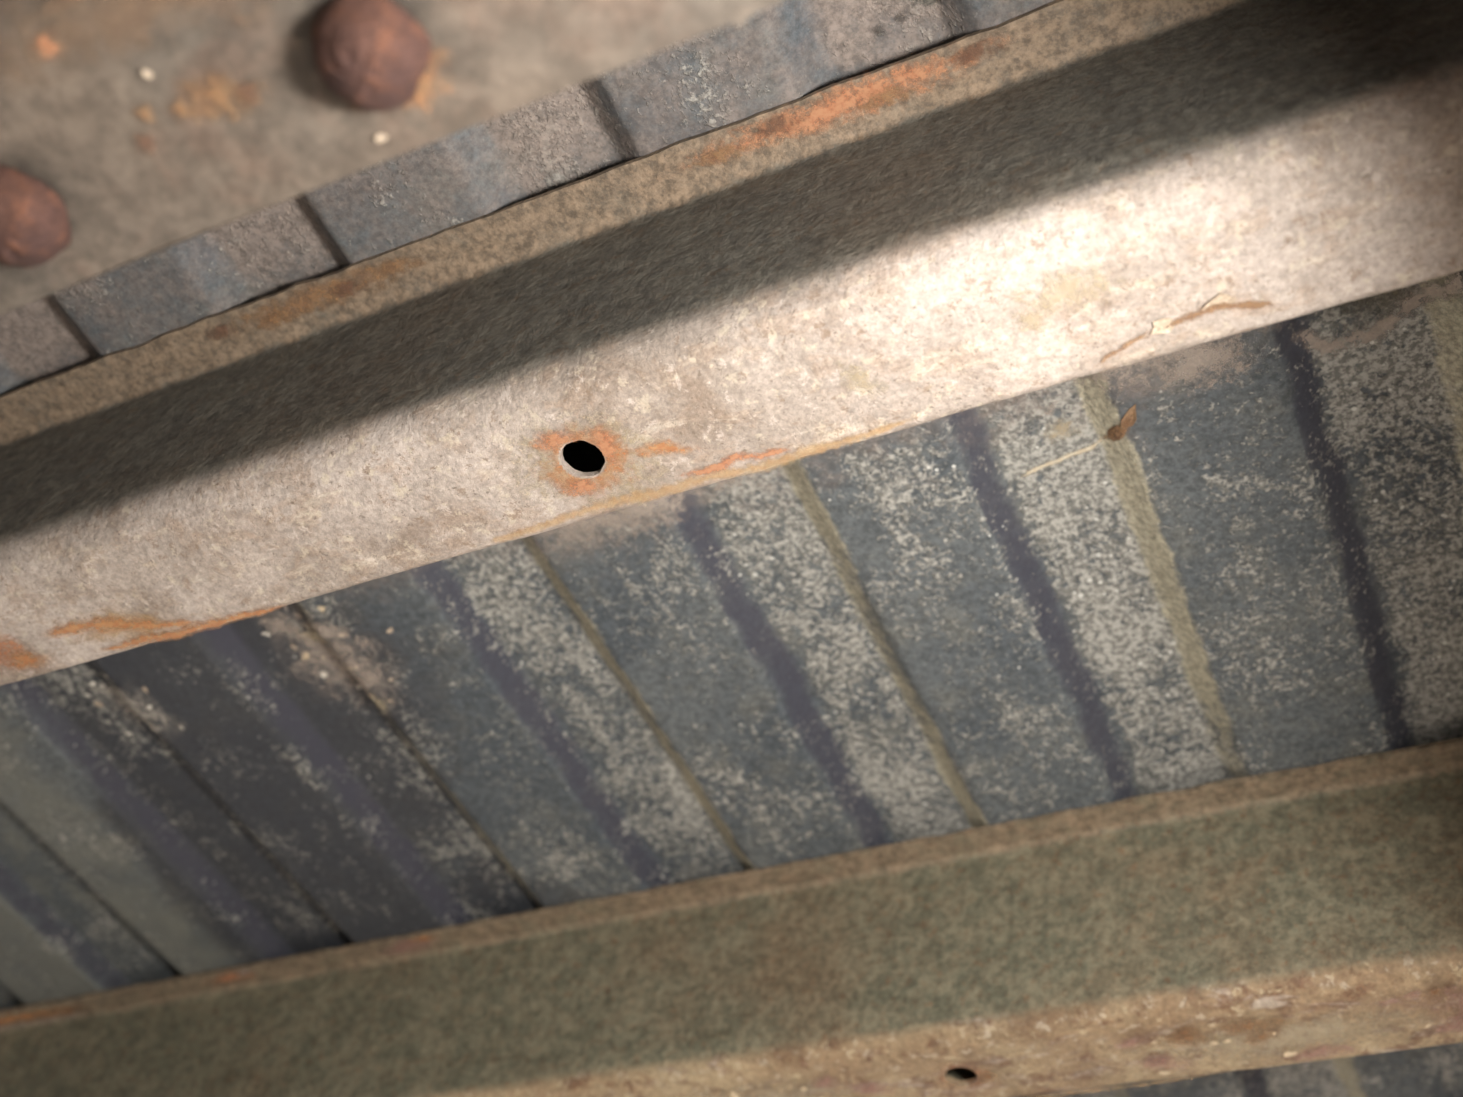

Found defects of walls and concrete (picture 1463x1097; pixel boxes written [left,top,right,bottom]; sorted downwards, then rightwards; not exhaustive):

corrosion [696,41,1004,165]
corrosion [518,417,686,502]
corrosion [681,448,787,476]
corrosion [50,607,275,650]